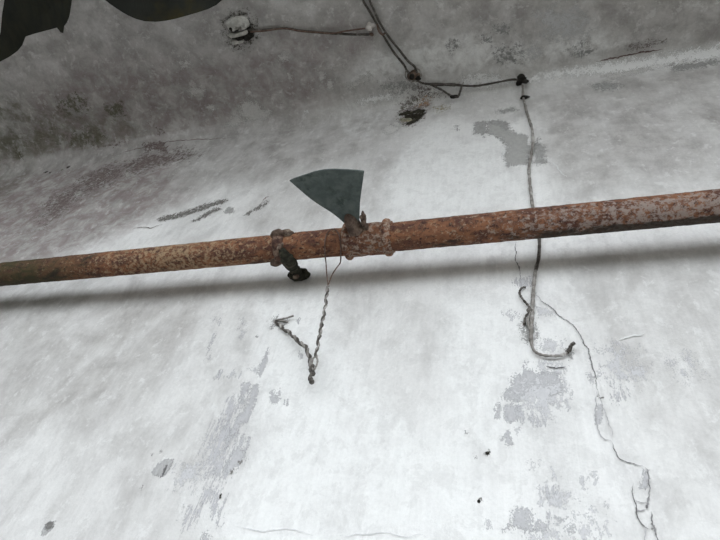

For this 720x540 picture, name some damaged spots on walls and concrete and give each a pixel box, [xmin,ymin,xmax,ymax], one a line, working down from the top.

peeling [473,107,548,167]
peeling [138,199,234,229]
peeling [494,357,573,446]
crack [539,297,658,540]
spalling [151,450,174,478]